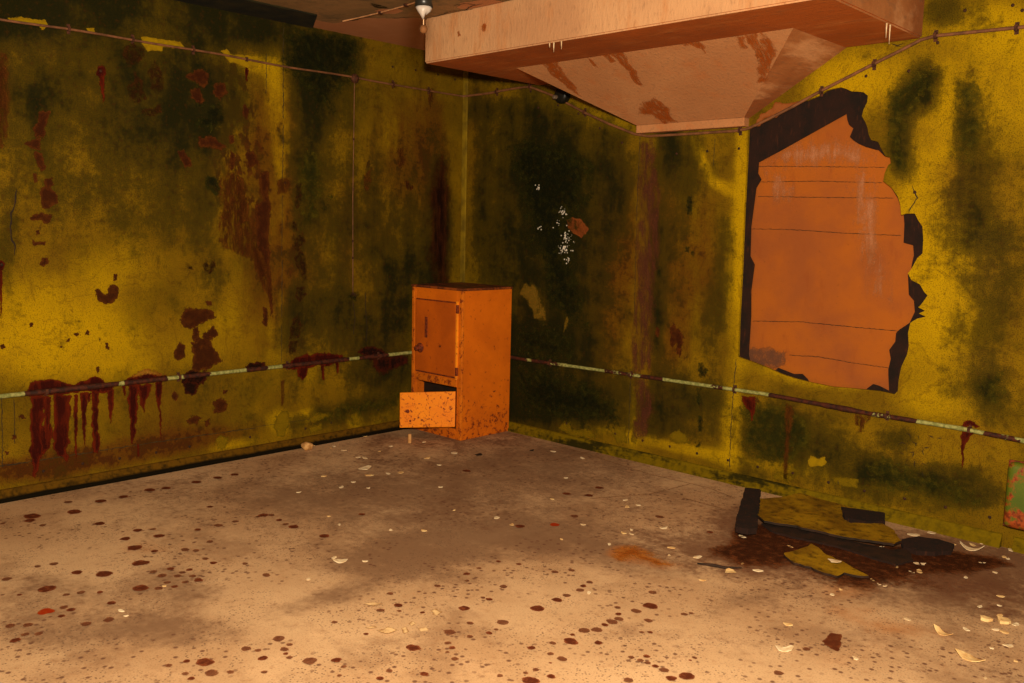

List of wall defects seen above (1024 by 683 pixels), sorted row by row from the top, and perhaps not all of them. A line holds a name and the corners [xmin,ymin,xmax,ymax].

peeling [141,36,184,52]
mould [281,28,362,119]
rust [639,98,678,124]
rust [738,32,776,83]
rust [219,171,290,326]
leakage [506,135,618,430]
leakage [632,141,660,439]
spalling [740,88,927,394]
rust [28,369,166,478]
rust [181,370,207,396]
rust [281,352,343,406]
rust [960,420,980,467]